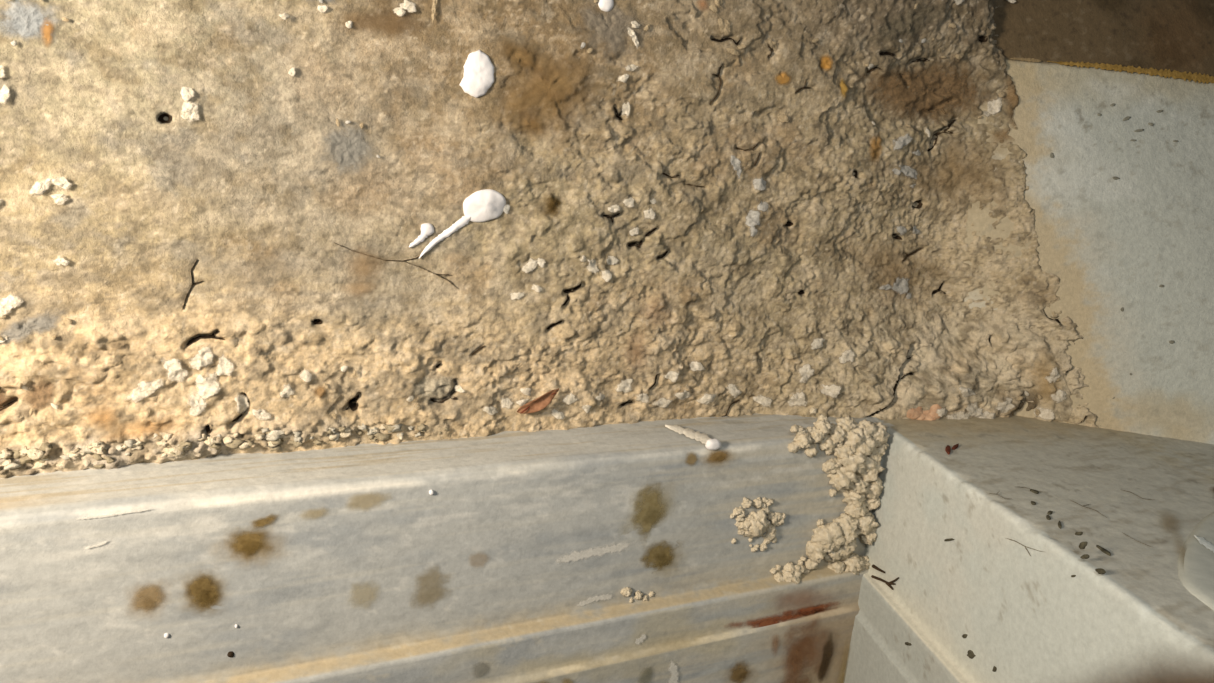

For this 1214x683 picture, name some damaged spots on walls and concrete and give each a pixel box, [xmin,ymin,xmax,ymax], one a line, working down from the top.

water stain [508,48,575,131]
water stain [635,487,664,534]
water stain [231,515,275,555]
water stain [643,542,673,569]
water stain [134,586,160,609]
water stain [188,576,219,608]
rust [736,604,831,628]
rust [774,636,833,683]